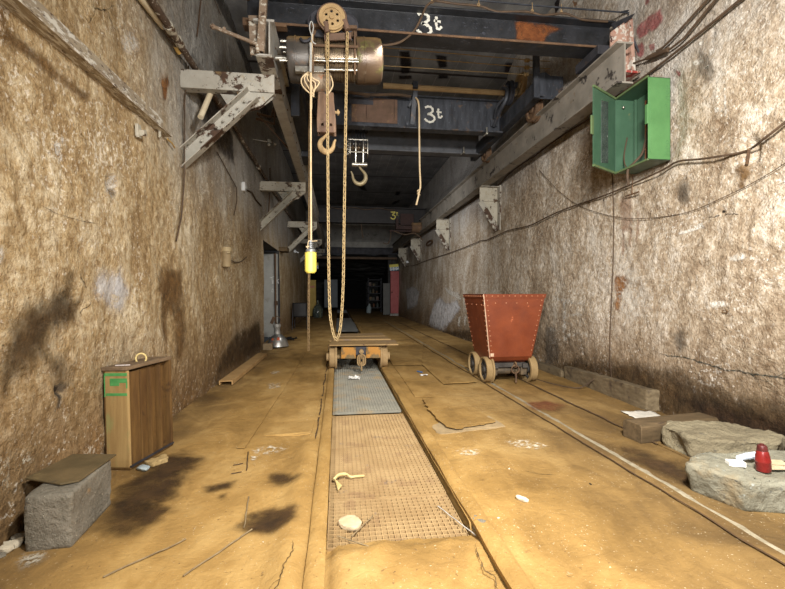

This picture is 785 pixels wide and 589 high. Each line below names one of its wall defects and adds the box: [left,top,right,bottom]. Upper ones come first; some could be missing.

rust [516,22,558,42]
water stain [10,295,76,370]
water stain [159,269,184,358]
water stain [219,324,261,373]
rust [615,276,628,309]
crack [388,322,785,565]
water stain [242,506,295,533]